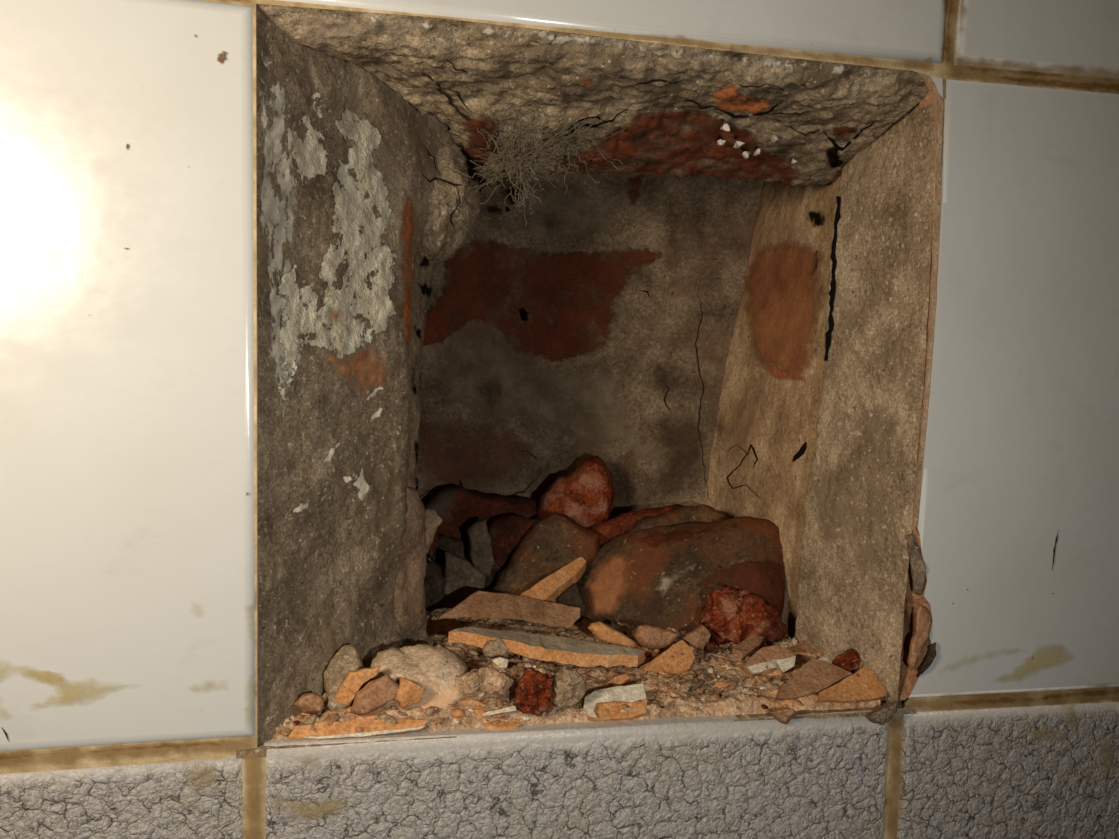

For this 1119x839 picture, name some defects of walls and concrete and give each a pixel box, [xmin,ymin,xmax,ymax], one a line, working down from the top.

crack [421,60,470,121]
flaking render [483,27,796,72]
spalling [564,85,795,204]
crack [543,79,876,151]
crack [420,145,462,231]
spalling [259,80,660,422]
spalling [744,243,817,381]
crack [814,196,841,361]
peeling [343,468,371,501]
crack [792,442,807,462]
spalling [898,526,936,701]
damp [40,674,99,703]